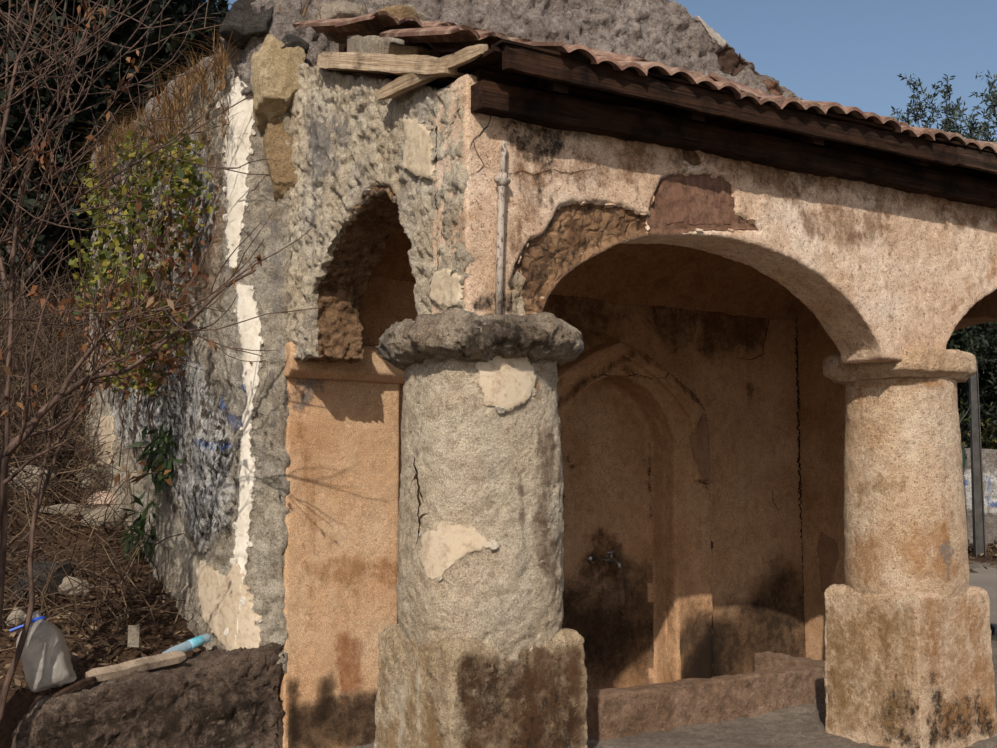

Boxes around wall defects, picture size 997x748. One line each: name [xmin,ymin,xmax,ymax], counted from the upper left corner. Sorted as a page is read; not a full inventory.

flaking render [510,150,759,314]
flaking render [475,356,536,413]
crack [412,457,428,544]
flaking render [419,521,499,583]
damp [288,662,385,748]
damp [459,529,654,748]
damp [680,571,806,679]
damp [825,607,995,748]